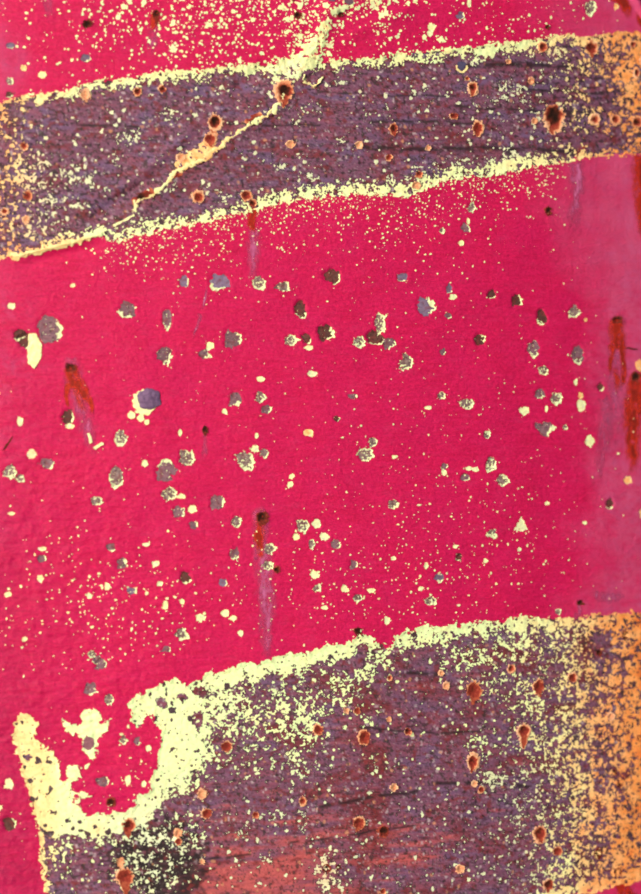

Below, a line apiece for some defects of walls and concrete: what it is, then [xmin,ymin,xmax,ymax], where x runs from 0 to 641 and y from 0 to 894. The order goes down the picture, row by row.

corrosion [612,0,641,25]
crack [113,93,285,227]
peeling [0,0,641,261]
corrosion [633,155,641,230]
peeling [14,315,63,369]
corrosion [64,365,94,432]
corrosion [608,319,641,466]
peeling [142,450,198,529]
peeling [234,433,269,471]
peeling [293,519,341,550]
corrosion [254,510,274,650]
peeling [4,600,641,894]